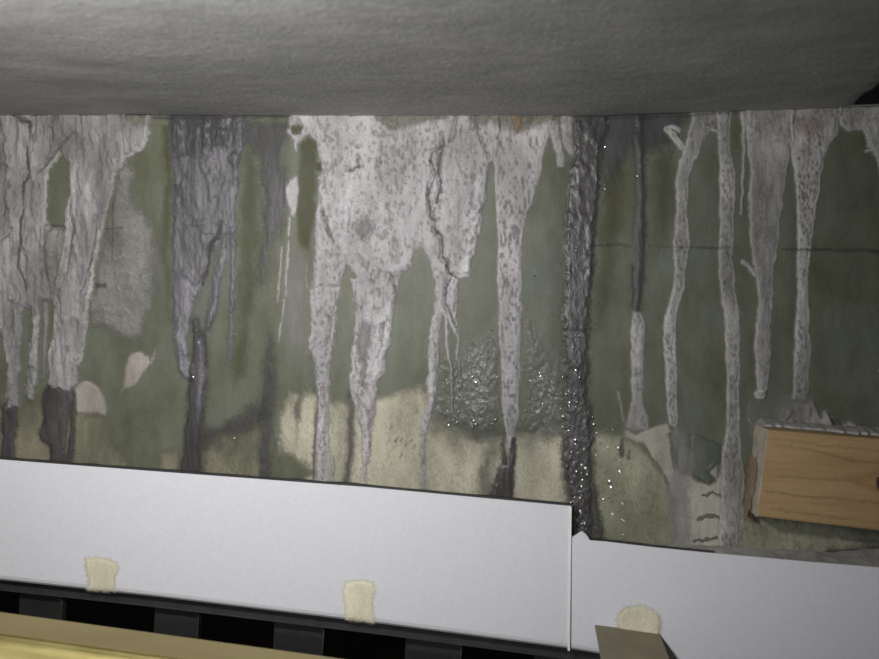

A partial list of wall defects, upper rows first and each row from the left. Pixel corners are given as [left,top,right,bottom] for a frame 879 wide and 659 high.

crack [0,116,31,291]
leakage [0,114,152,462]
crack [427,139,456,327]
leakage [170,106,879,547]